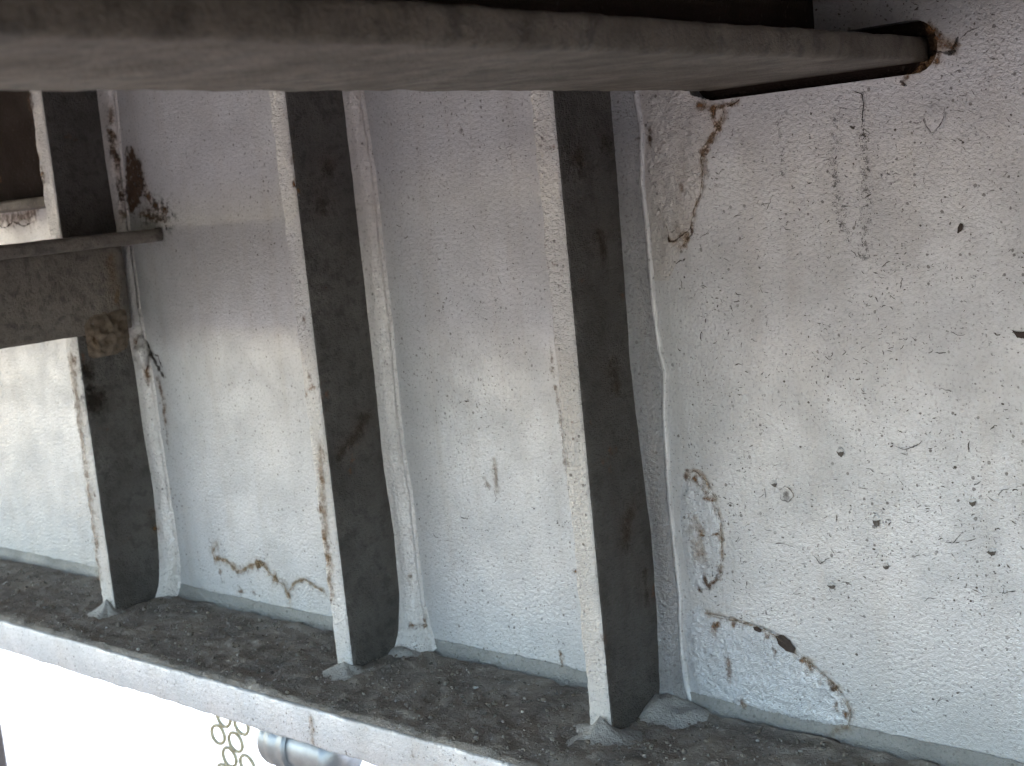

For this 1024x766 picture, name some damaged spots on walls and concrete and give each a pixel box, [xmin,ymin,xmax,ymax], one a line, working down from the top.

corrosion [900,22,976,86]
corrosion [107,108,168,230]
crack [212,546,325,598]